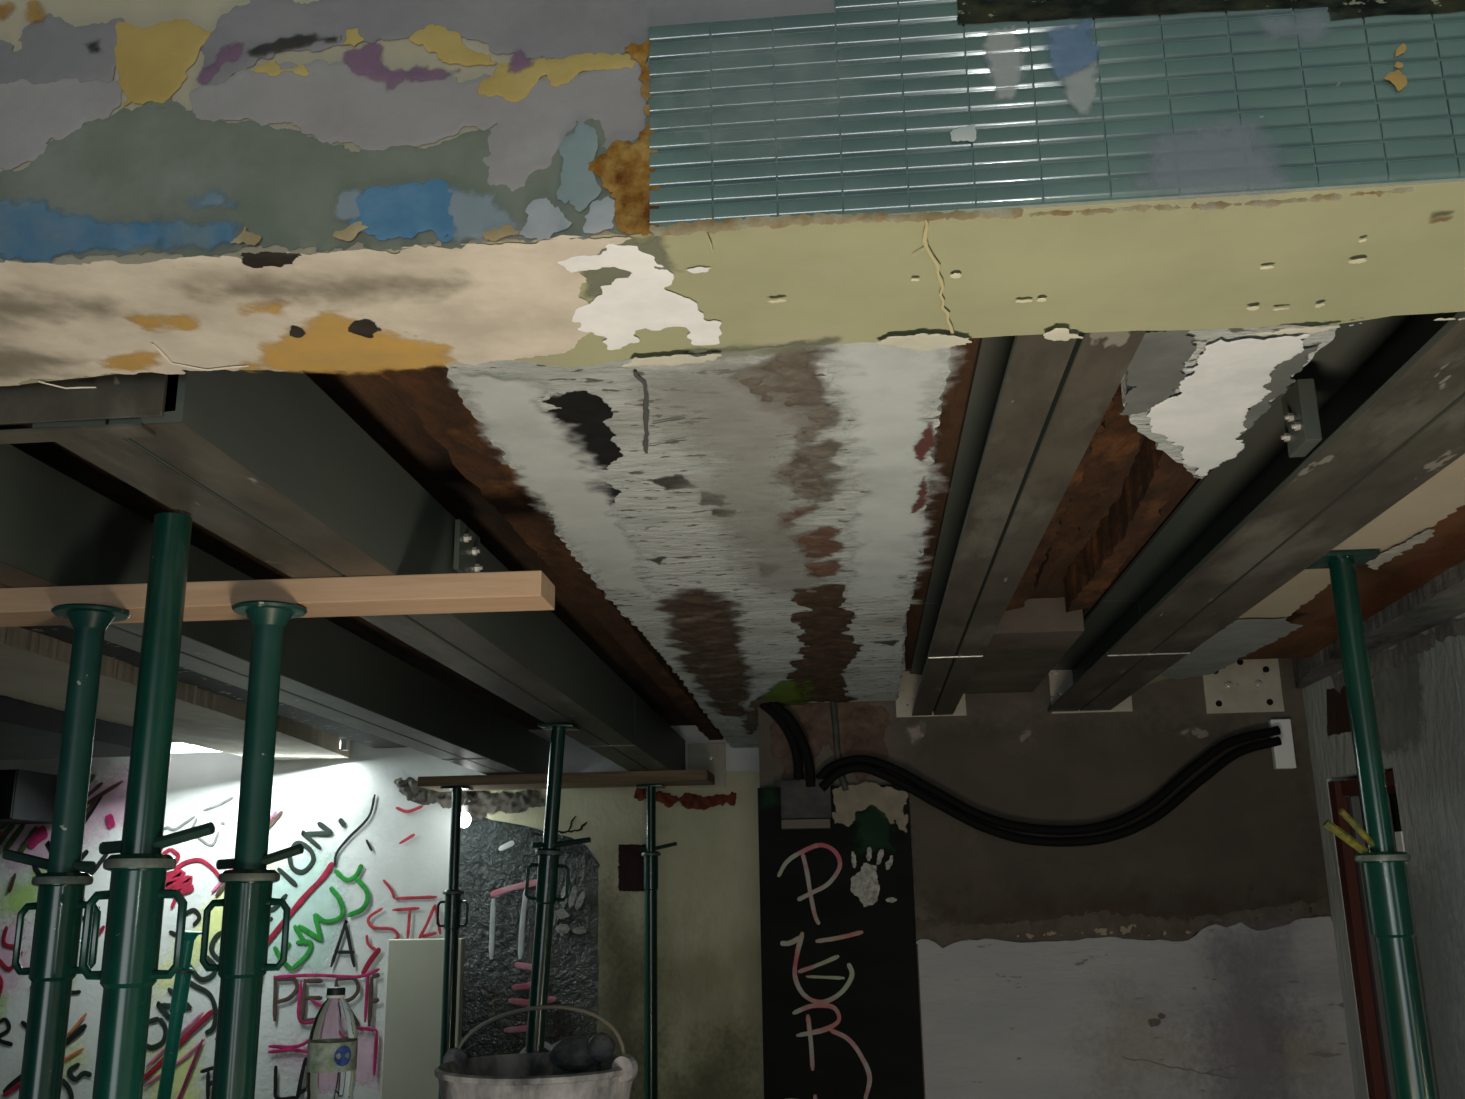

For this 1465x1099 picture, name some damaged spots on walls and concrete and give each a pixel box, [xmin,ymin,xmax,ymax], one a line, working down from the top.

spalling [0,0,1330,949]